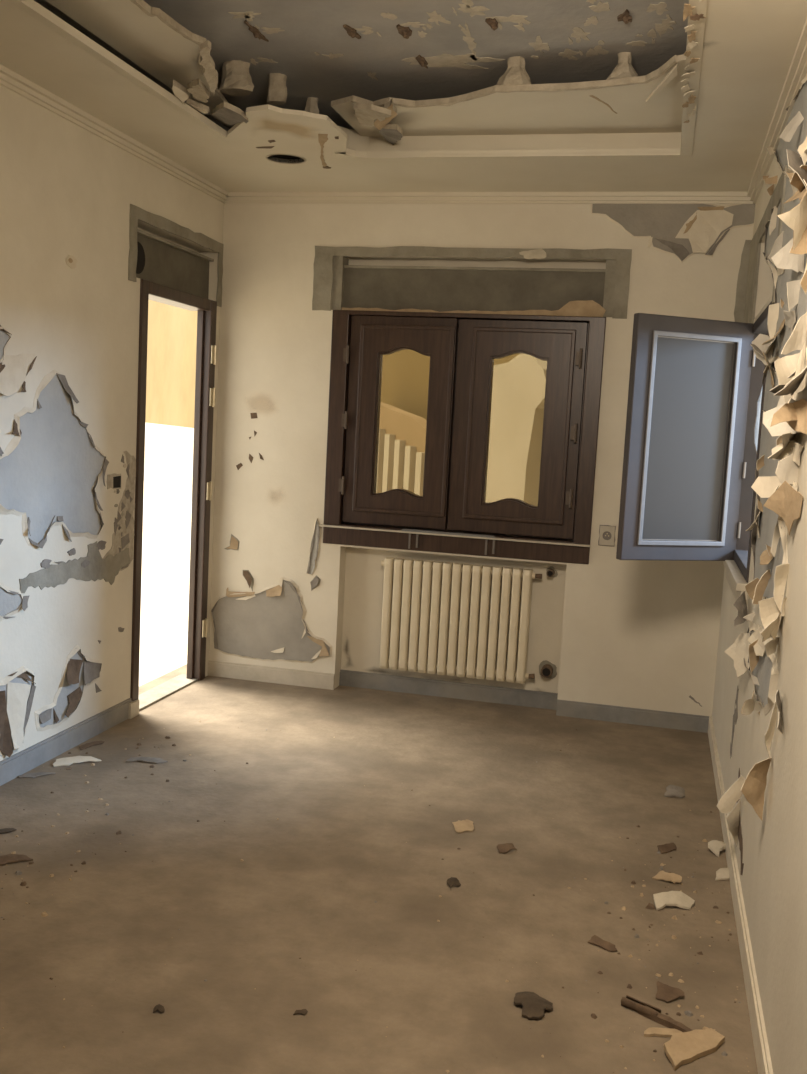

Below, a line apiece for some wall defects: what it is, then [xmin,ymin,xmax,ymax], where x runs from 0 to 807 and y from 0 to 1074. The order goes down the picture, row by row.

peeling [0,324,136,571]
peeling [591,75,807,847]
peeling [0,582,30,622]
peeling [211,518,332,664]
peeling [0,644,102,759]